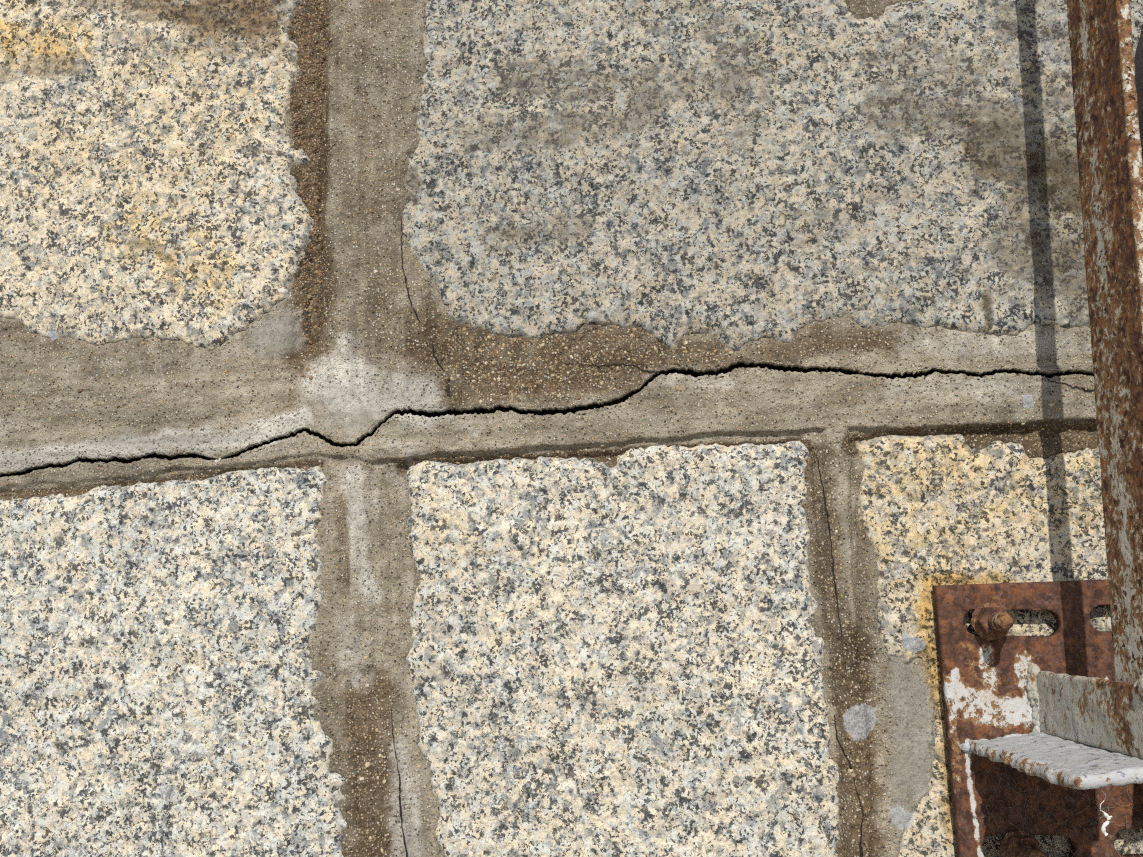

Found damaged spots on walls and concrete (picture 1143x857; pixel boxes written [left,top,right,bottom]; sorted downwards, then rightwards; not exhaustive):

crack [0,358,1094,481]